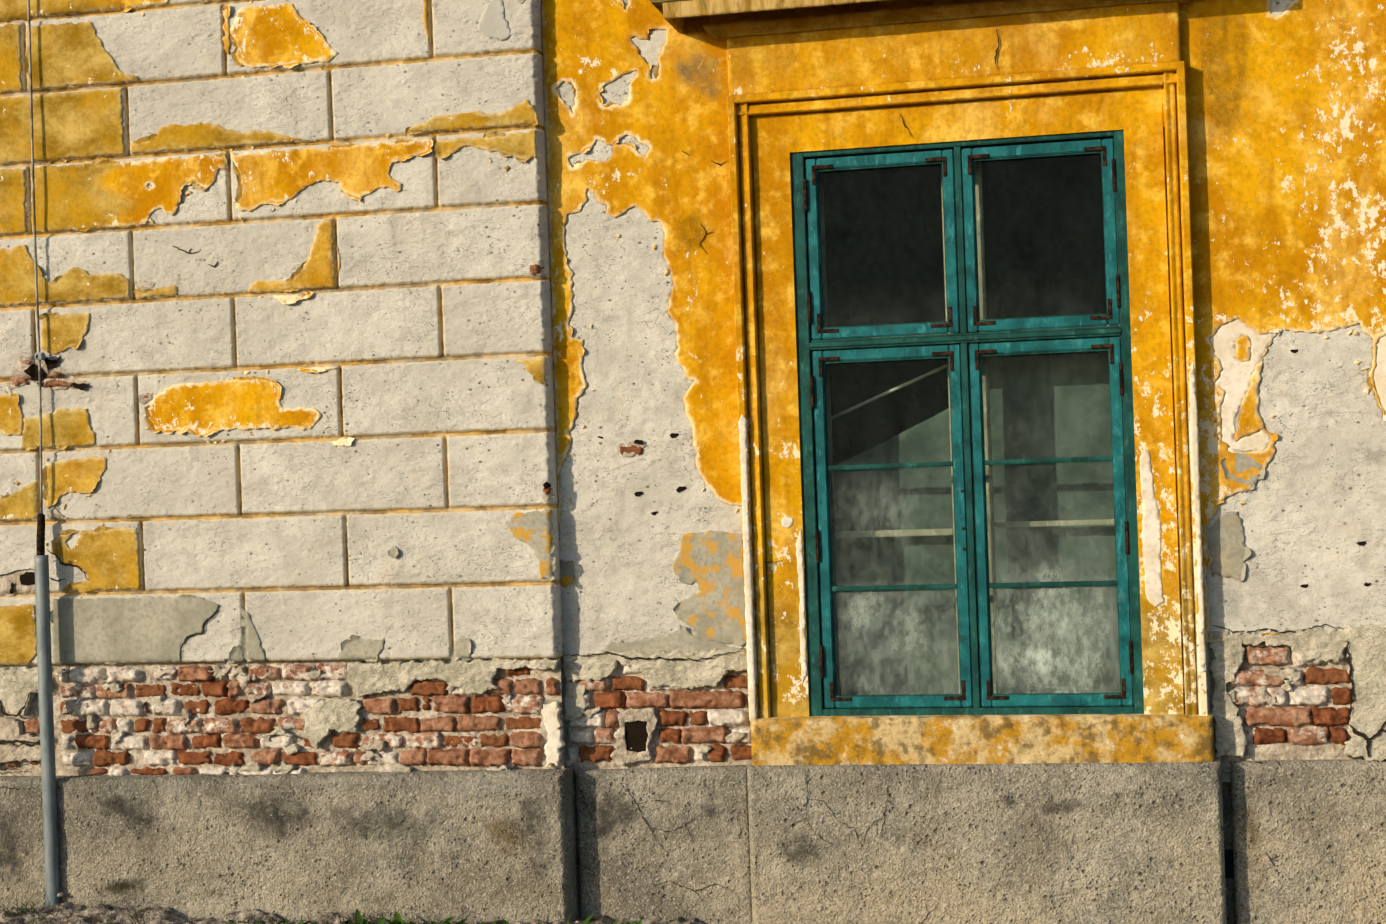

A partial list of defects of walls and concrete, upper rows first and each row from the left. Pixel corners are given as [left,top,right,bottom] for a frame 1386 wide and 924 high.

peeling [556,81,576,112]
peeling [569,135,649,169]
peeling [598,26,666,108]
peeling [1270,0,1294,16]
peeling [0,0,538,592]
spalling [0,189,757,776]
peeling [1189,319,1386,772]
crack [1213,624,1386,757]